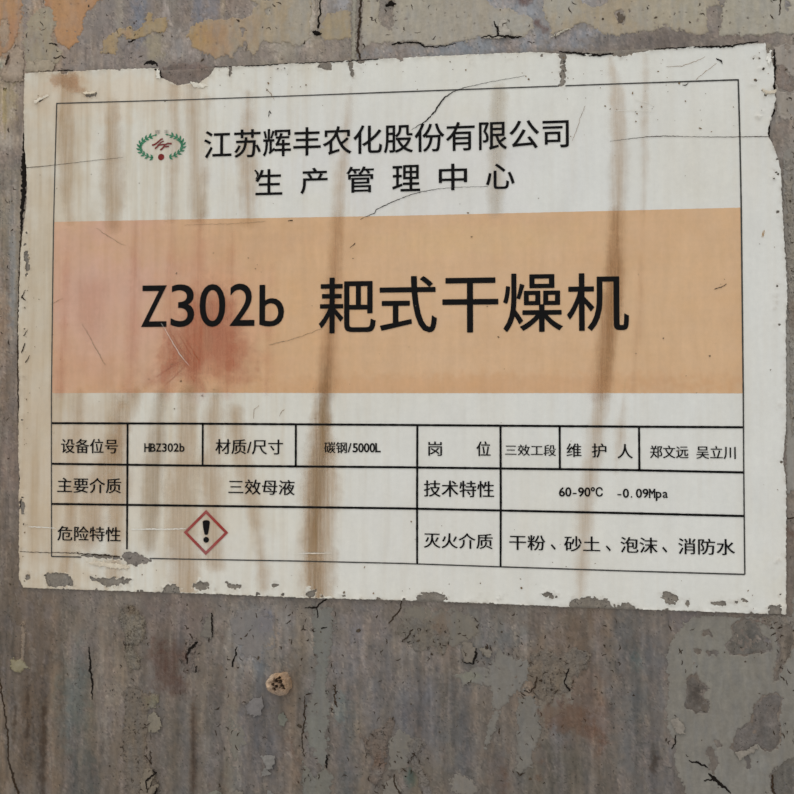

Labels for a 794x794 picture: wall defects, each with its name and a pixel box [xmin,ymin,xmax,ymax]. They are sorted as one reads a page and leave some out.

crack [5,0,66,65]
peeling [0,0,99,71]
peeling [162,0,535,70]
peeling [542,0,794,120]
peeling [782,147,794,495]
crack [0,679,20,794]
crack [170,604,257,755]
crack [279,599,429,794]
peeling [400,605,580,777]
crack [376,601,621,781]
crack [668,715,731,793]
peeling [663,587,794,794]